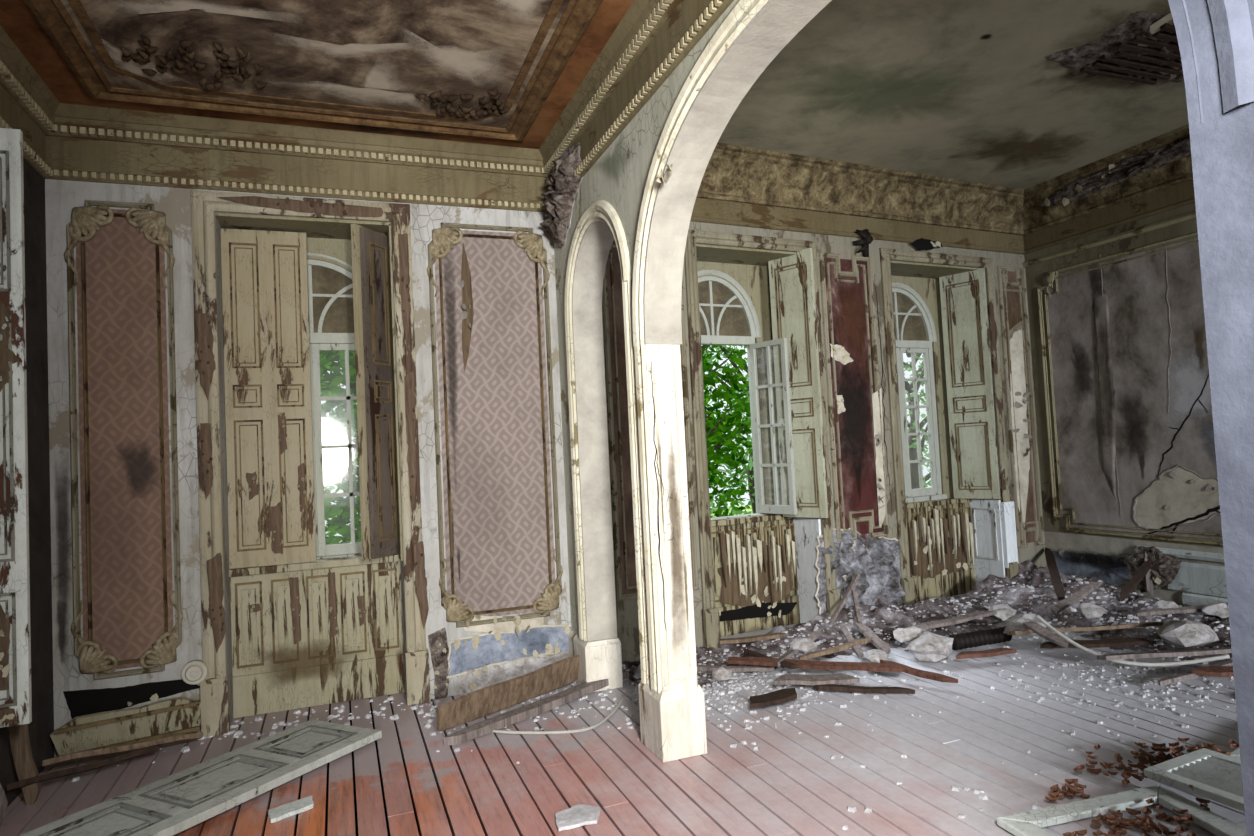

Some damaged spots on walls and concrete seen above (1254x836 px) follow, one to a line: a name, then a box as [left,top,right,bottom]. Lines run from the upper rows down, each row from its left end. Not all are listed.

damp [978,137,1072,163]
flaking render [1040,135,1191,207]
peeling [195,313,216,400]
crack [1156,252,1209,477]
damp [837,293,878,545]
damp [123,452,153,491]
peeling [1133,464,1221,531]
peeling [289,577,301,645]
flaking render [413,541,572,699]
peeling [717,531,797,622]
flaking render [1051,546,1182,593]
flaking render [63,679,200,719]